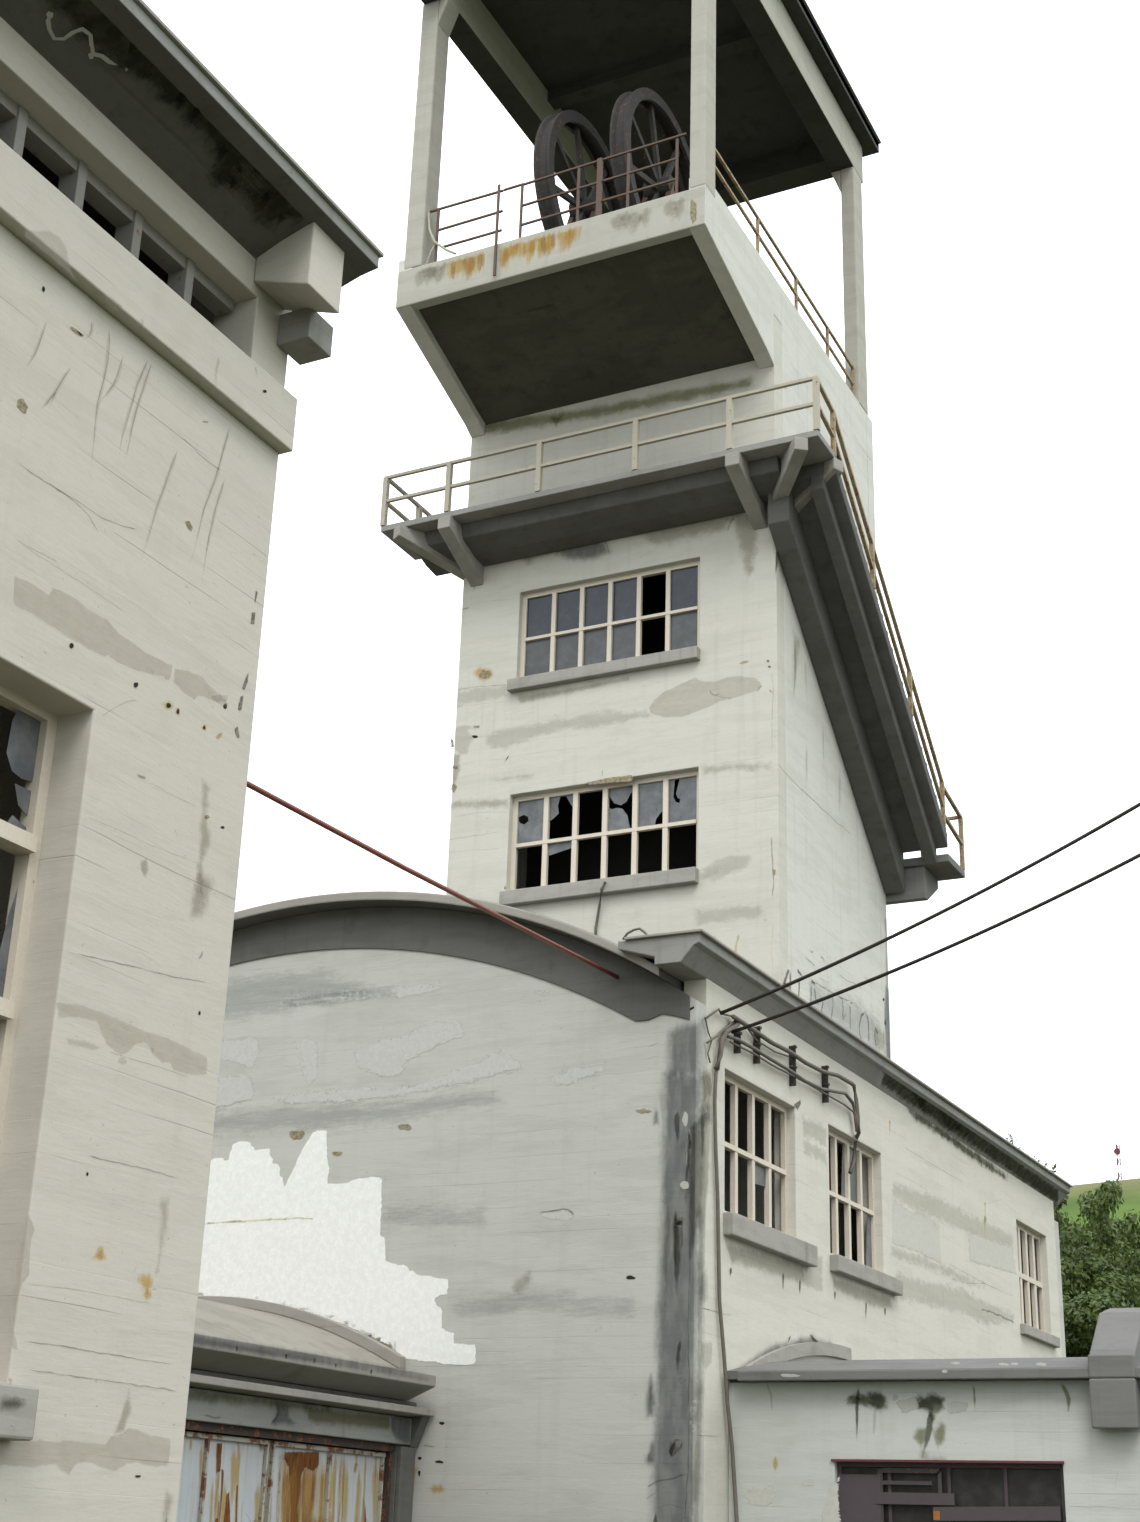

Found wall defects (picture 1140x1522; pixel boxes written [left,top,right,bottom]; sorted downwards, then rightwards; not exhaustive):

spalling [289,1131,305,1140]
water stain [851,1394,968,1413]
rust [215,1443,238,1522]
rust [285,1451,319,1522]